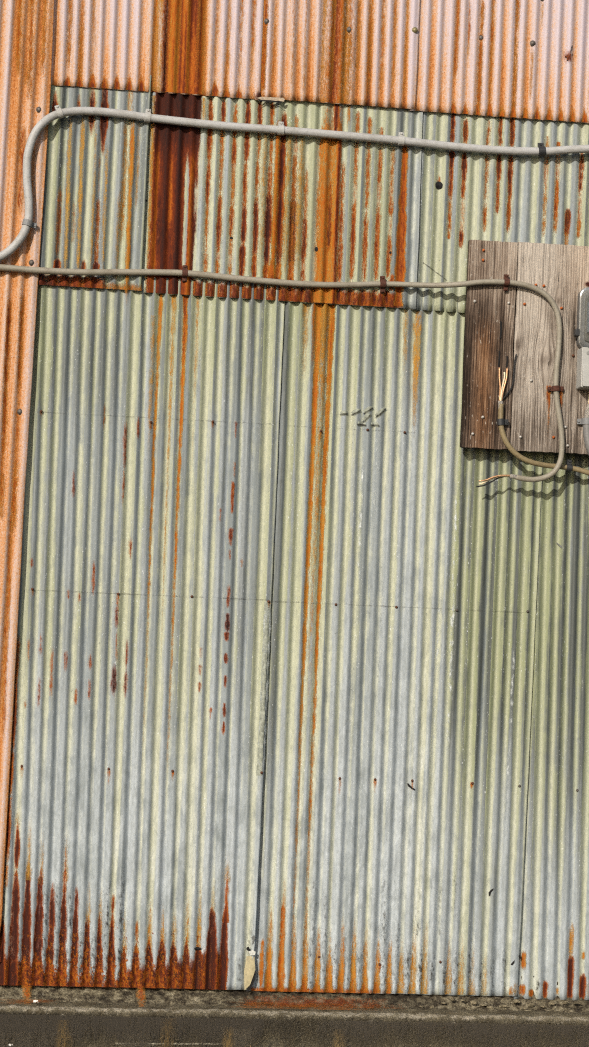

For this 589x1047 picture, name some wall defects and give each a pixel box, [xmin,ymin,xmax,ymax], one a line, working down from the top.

rust [16,0,46,95]
rust [17,131,25,207]
rust [447,0,587,247]
rust [38,0,428,1010]
rust [0,297,229,1006]
rust [445,952,486,995]
rust [509,927,586,999]